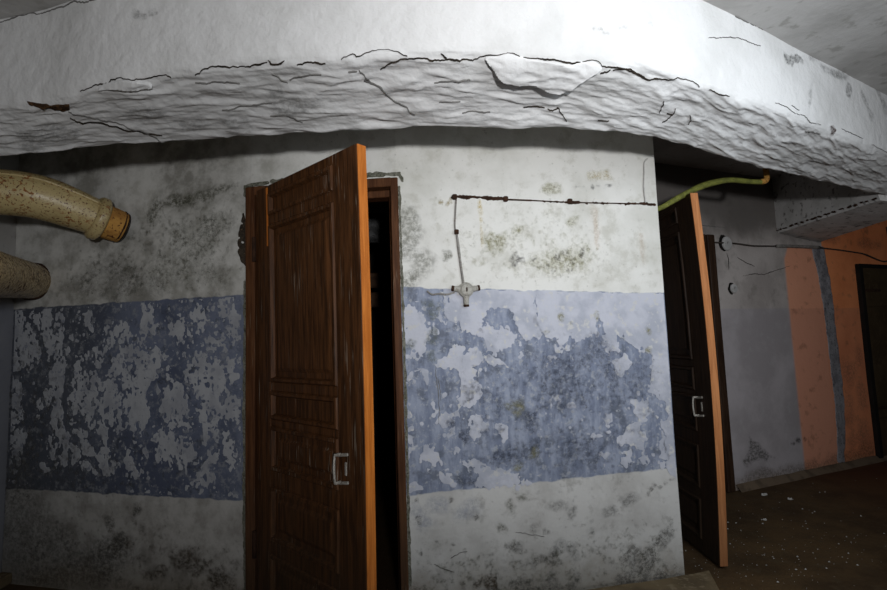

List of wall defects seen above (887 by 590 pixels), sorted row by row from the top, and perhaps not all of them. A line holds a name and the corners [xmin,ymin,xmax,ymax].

crack [80,74,171,92]
crack [195,49,730,115]
crack [68,111,166,143]
crack [222,103,303,123]
crack [523,106,567,122]
crack [776,103,821,135]
peeling [367,171,676,587]
peeling [8,297,241,498]